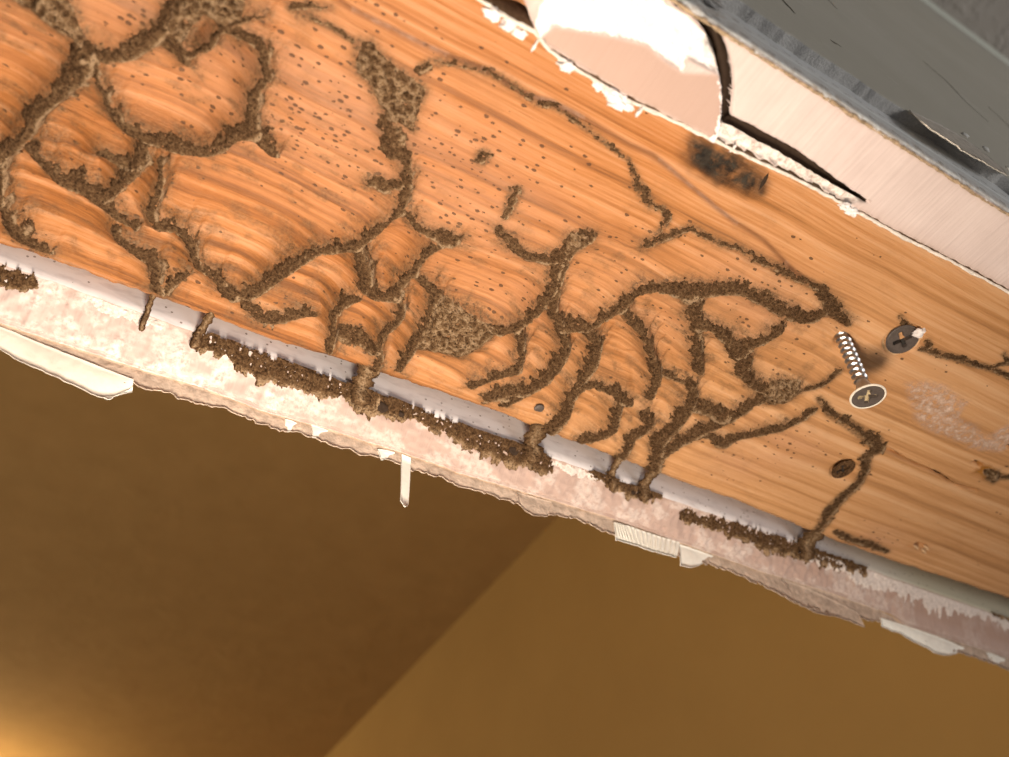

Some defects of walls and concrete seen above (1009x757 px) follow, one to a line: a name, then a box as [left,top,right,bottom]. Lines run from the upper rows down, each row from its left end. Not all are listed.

crack [675,0,866,202]
peeling [0,327,134,400]
peeling [781,578,865,627]
peeling [880,618,964,656]
peeling [986,652,1006,664]